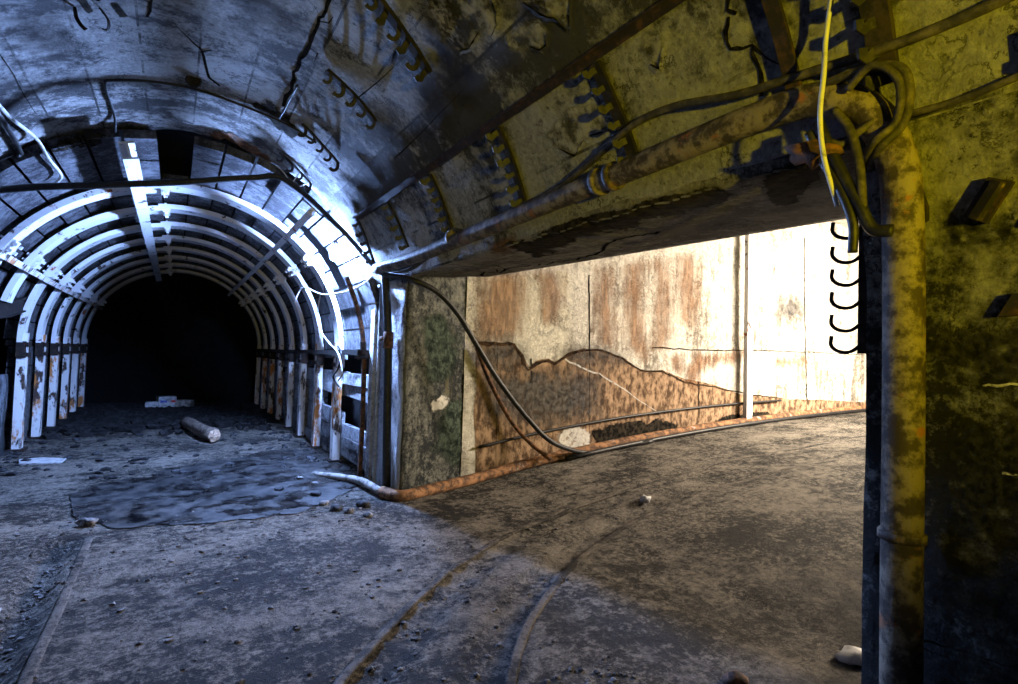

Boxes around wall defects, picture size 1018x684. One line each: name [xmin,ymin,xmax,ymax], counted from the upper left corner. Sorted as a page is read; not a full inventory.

crack [145,0,220,86]
crack [723,0,779,96]
rust [481,278,520,339]
rust [541,273,558,320]
rust [601,273,611,343]
rust [626,266,645,356]
rust [682,259,694,319]
damp [423,314,459,384]
damp [929,328,1018,389]
spalling [559,418,678,448]
damp [924,417,1018,684]